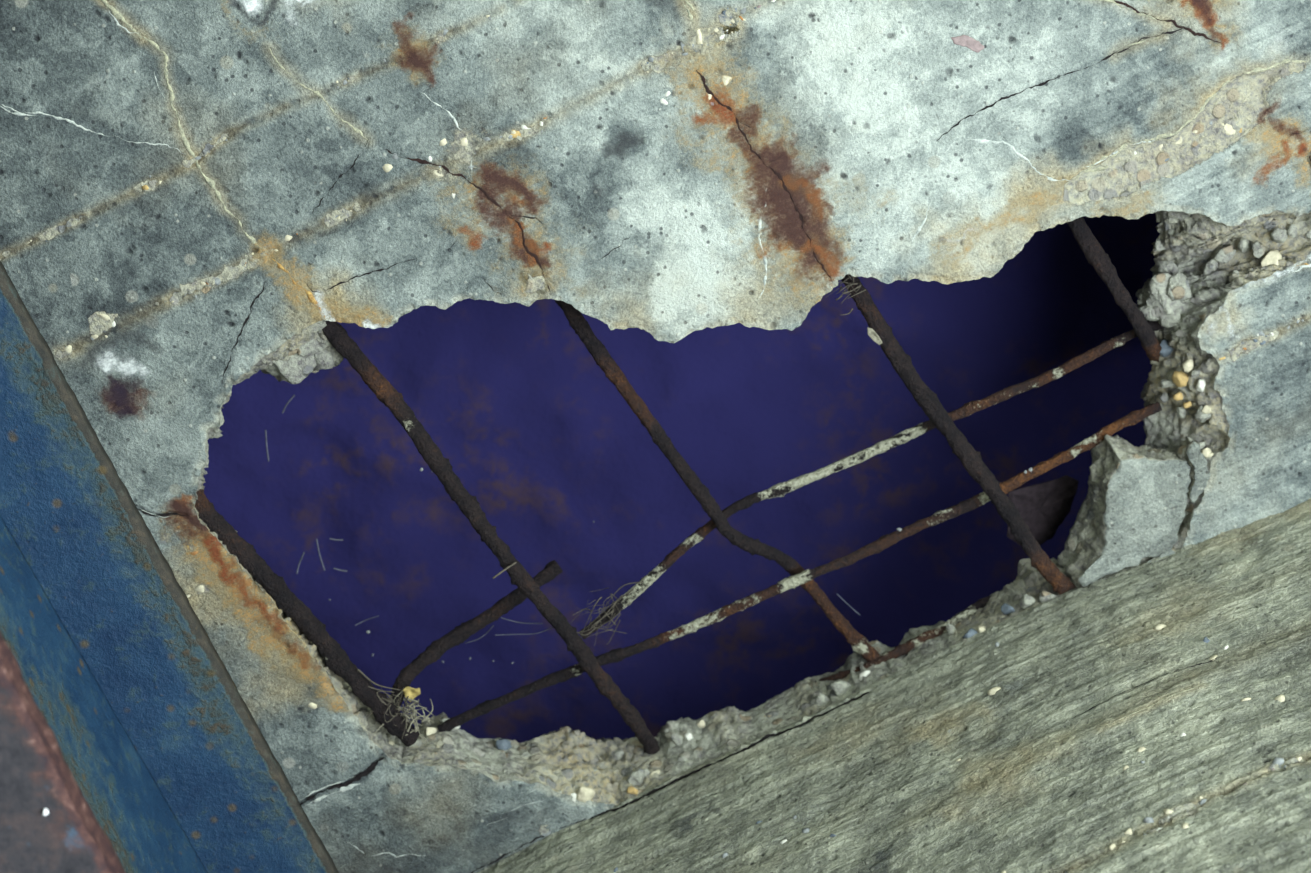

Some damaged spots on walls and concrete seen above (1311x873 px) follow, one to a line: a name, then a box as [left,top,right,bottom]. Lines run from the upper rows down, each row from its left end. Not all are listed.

crack [0,0,415,385]
corrosion [453,164,560,292]
crack [682,0,696,32]
spalling [673,25,721,63]
corrosion [673,55,847,301]
crack [937,0,1308,181]
corrosion [1181,0,1228,49]
corrosion [1254,104,1311,180]
spalling [194,60,1311,805]
spalling [186,583,209,598]
corrosion [165,496,346,711]
crack [471,692,869,873]